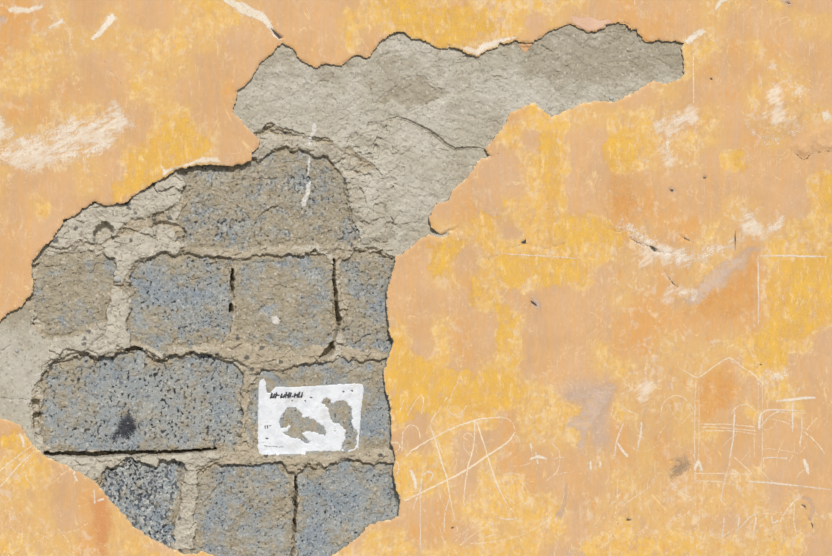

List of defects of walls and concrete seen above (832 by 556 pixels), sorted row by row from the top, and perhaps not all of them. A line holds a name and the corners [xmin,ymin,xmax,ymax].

peeling [0,3,45,26]
peeling [91,13,117,41]
peeling [570,15,612,31]
spalling [0,22,685,556]